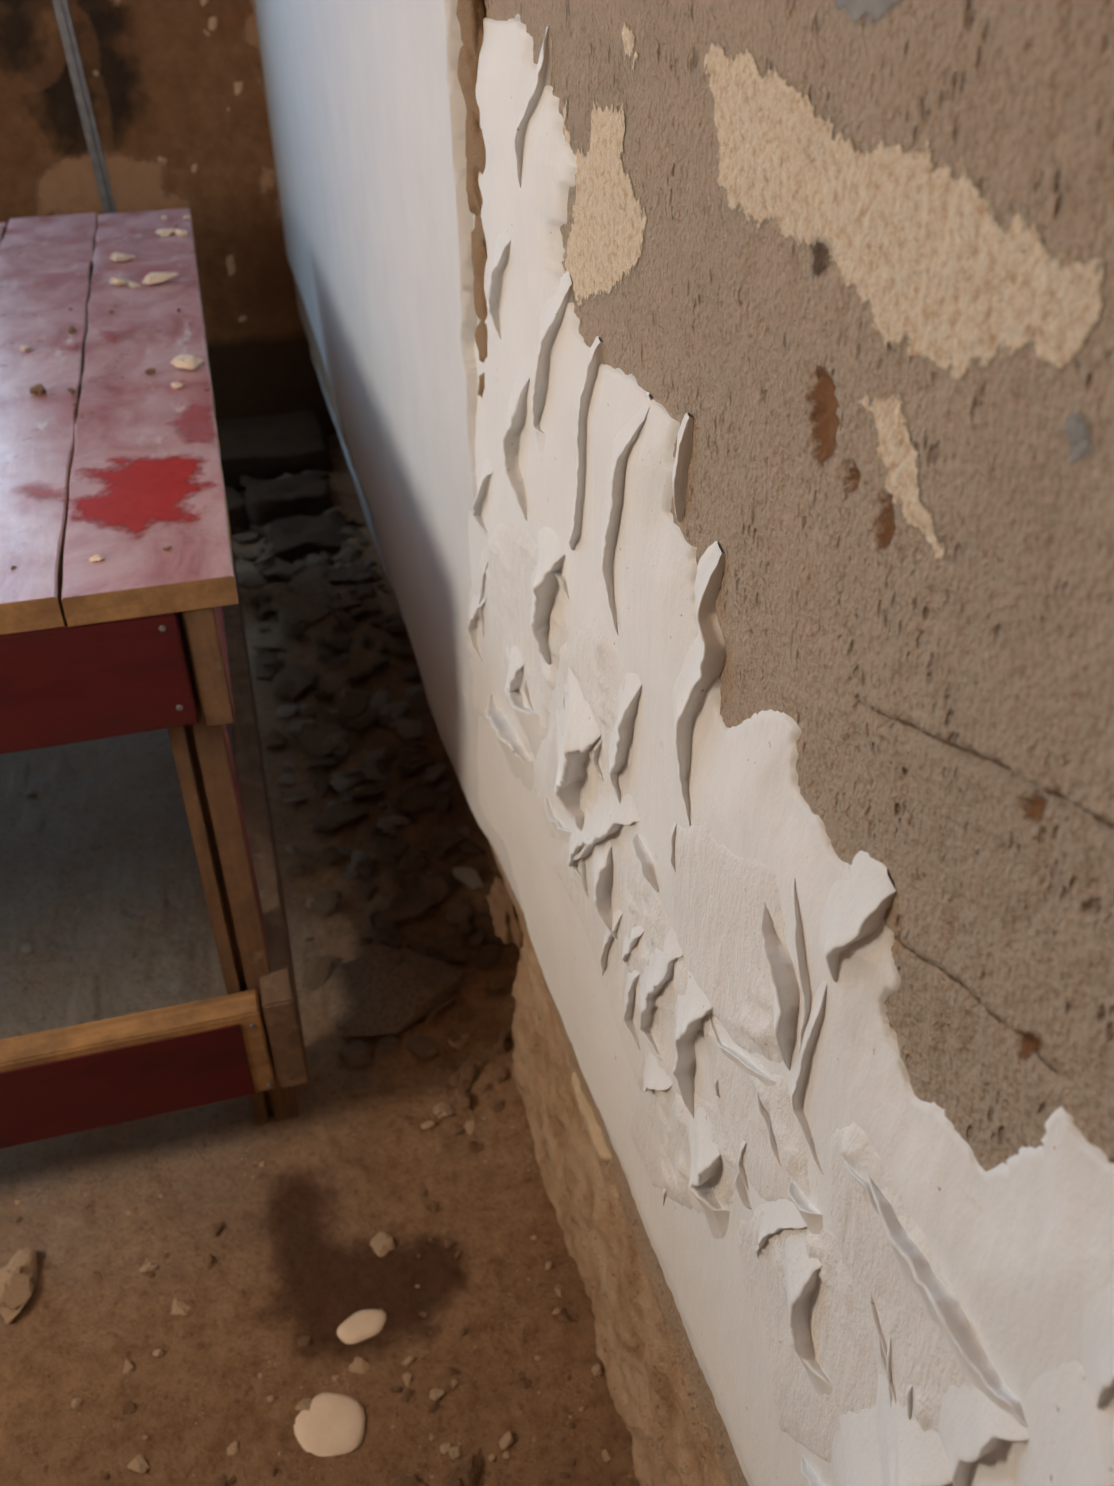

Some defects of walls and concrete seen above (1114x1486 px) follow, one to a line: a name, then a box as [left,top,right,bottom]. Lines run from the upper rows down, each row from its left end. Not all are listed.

spalling [621,22,638,70]
spalling [563,98,647,306]
spalling [704,42,1104,381]
spalling [806,366,840,466]
spalling [844,464,860,498]
spalling [857,383,945,559]
crack [874,710,1012,770]
spalling [1022,794,1045,822]
crack [1044,789,1114,828]
crack [894,934,1011,1029]
spalling [1017,1031,1041,1060]
crack [1037,1053,1056,1071]